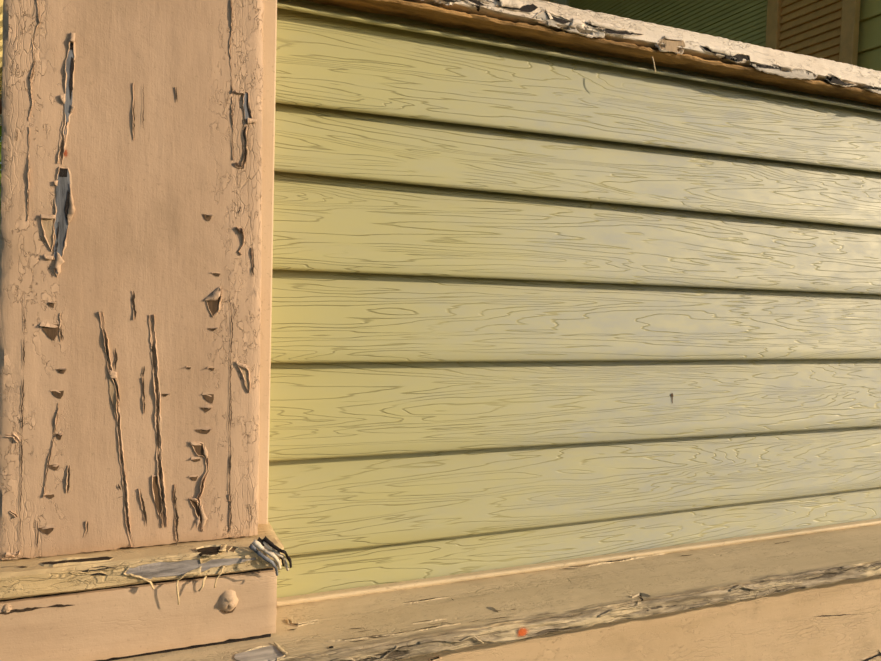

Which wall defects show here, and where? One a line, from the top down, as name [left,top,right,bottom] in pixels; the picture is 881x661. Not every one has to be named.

peeling [496,0,643,38]
peeling [60,33,76,144]
peeling [652,36,685,73]
peeling [700,45,857,87]
peeling [40,167,75,277]
crack [235,206,254,276]
peeling [204,272,221,331]
peeling [108,370,120,420]
crack [99,289,252,547]
crack [70,566,126,576]
peeling [249,536,292,576]
crack [857,650,881,661]